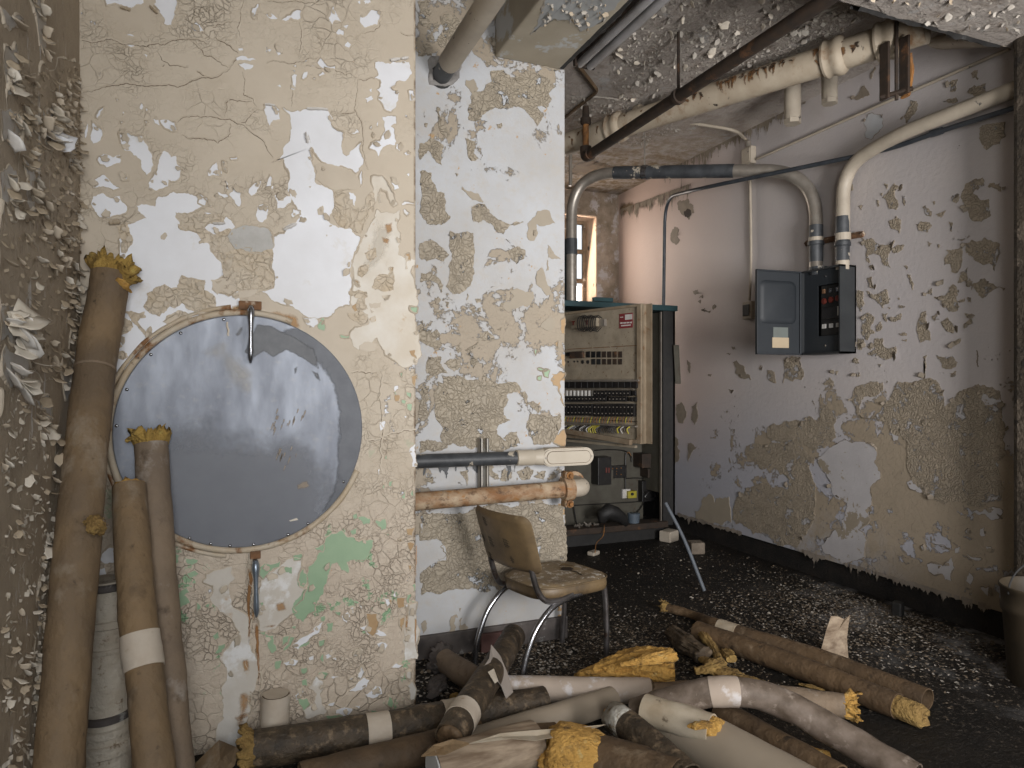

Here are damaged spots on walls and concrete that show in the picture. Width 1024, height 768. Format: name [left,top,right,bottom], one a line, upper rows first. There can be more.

crack [81,0,374,170]
peeling [530,0,633,69]
peeling [566,0,1021,124]
peeling [465,138,478,161]
peeling [0,0,462,768]
peeling [424,465,545,484]
peeling [554,423,566,446]
peeling [817,440,881,564]
peeling [823,284,905,387]
peeling [908,193,989,377]
corrosion [243,571,260,677]
crack [245,553,263,704]